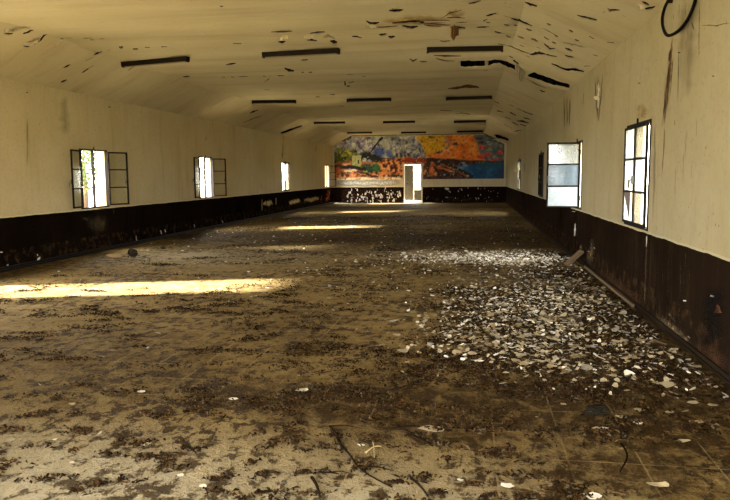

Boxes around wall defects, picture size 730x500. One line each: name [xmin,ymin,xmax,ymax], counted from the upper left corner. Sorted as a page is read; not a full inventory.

peeling [366,10,466,40]
spalling [528,72,569,88]
peeling [340,180,401,203]